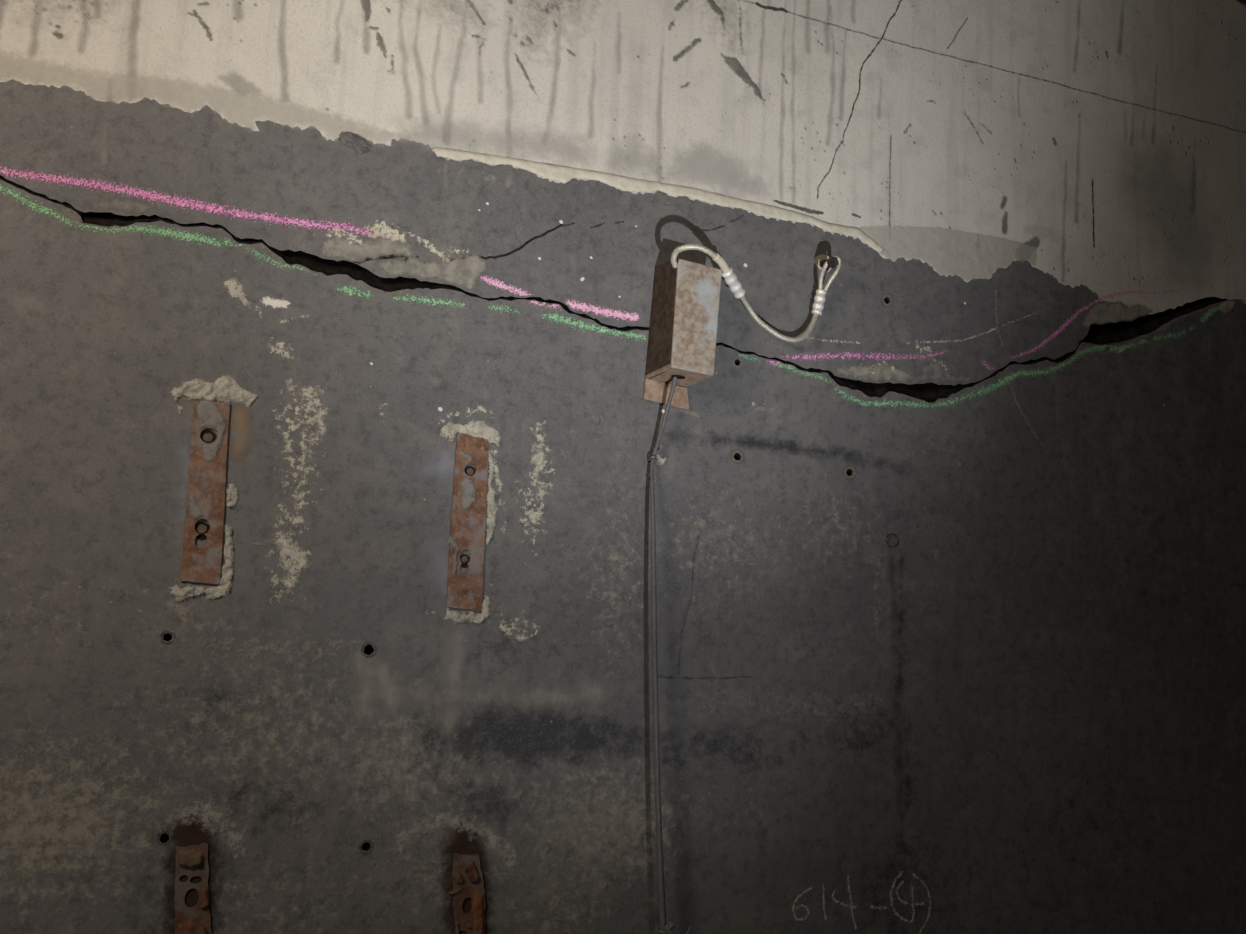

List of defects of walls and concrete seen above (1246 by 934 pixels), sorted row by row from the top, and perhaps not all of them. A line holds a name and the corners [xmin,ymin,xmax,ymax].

crack [0,175,649,331]
peeling [338,131,372,155]
peeling [433,148,1036,280]
crack [817,0,902,199]
crack [886,136,894,227]
crack [716,297,1228,403]
corrosion [197,400,250,461]
corrosion [460,477,476,510]
corrosion [167,816,216,933]
corrosion [444,823,490,934]